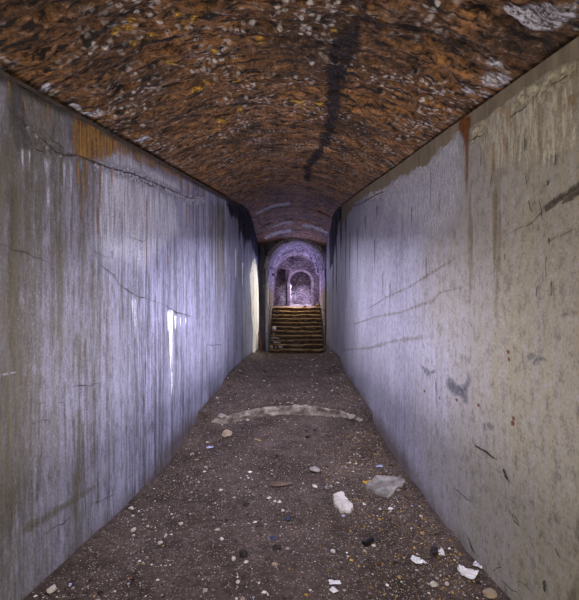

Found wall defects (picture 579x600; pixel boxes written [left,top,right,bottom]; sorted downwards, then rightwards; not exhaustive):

damp [303,0,384,180]
rust [72,119,154,233]
crack [24,131,203,200]
damp [100,154,177,269]
rust [459,115,471,186]
crack [515,173,543,231]
crack [95,251,190,316]
damp [211,202,293,352]
damp [167,310,186,395]